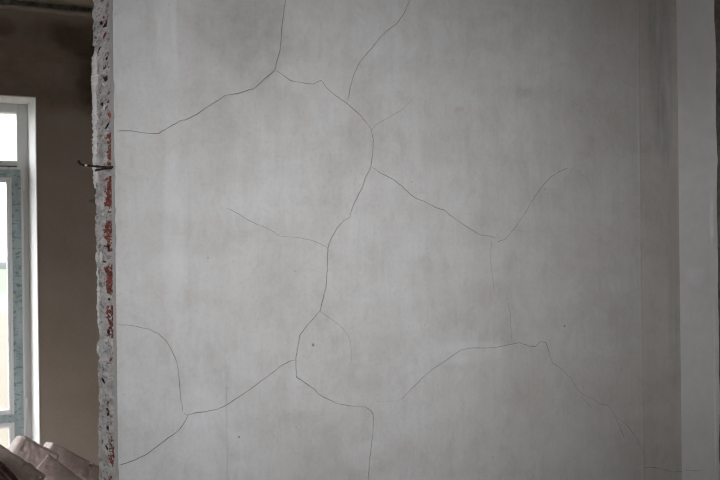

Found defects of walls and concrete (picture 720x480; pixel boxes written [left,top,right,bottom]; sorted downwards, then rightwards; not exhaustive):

crack [120,1,409,137]
crack [119,155,576,465]